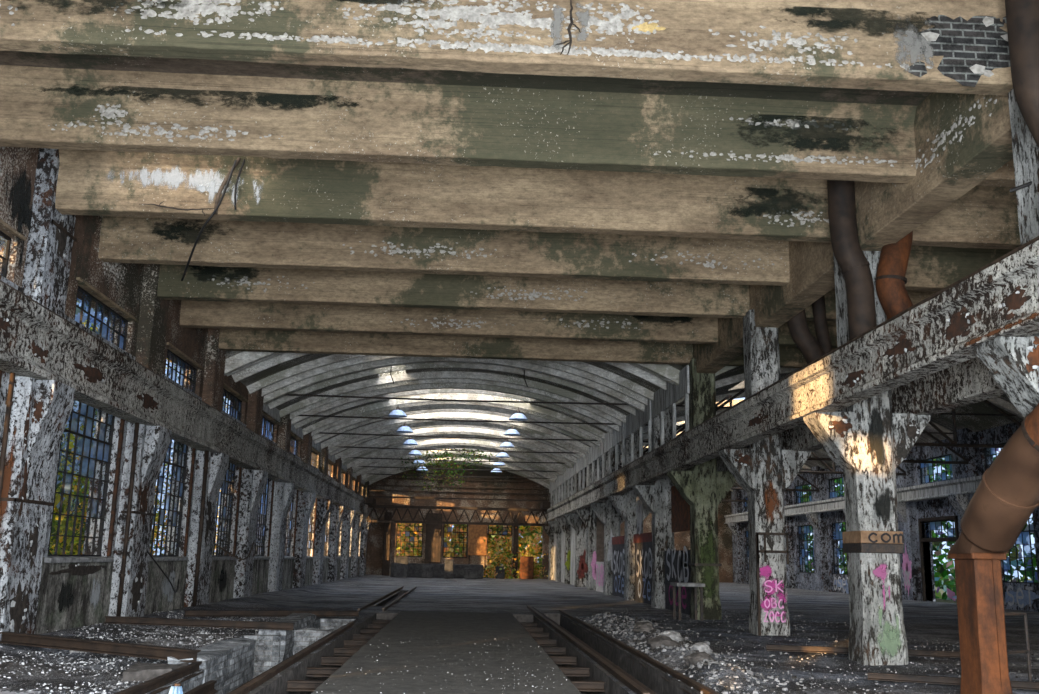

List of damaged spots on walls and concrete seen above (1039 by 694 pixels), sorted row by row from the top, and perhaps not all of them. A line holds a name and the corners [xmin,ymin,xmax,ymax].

leakage [0,0,938,69]
crack [555,0,581,55]
spalling [909,15,1011,87]
leakage [41,84,358,142]
leakage [654,114,898,167]
leakage [911,95,997,173]
leakage [730,187,829,227]
peeling [944,307,976,340]
peeling [999,285,1032,320]
peeling [1026,336,1039,373]
peeling [828,415,853,438]
peeling [19,394,44,516]